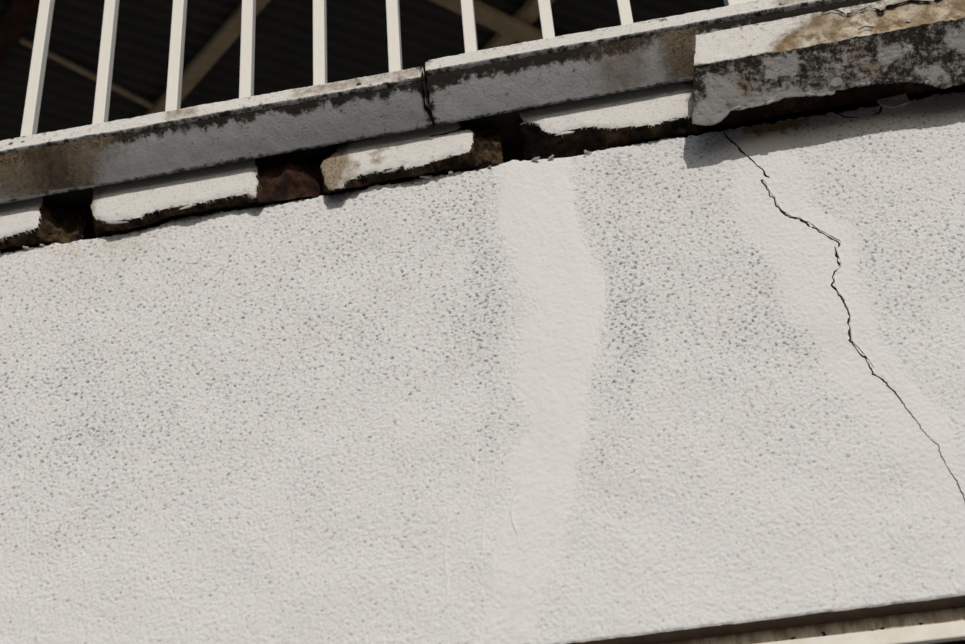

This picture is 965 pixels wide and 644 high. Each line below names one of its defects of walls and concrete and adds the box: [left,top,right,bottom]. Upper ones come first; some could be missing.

spalling [775,0,965,52]
leakage [0,136,118,198]
spalling [0,160,276,254]
spalling [319,123,506,196]
spalling [518,71,945,162]
crack [723,132,965,500]